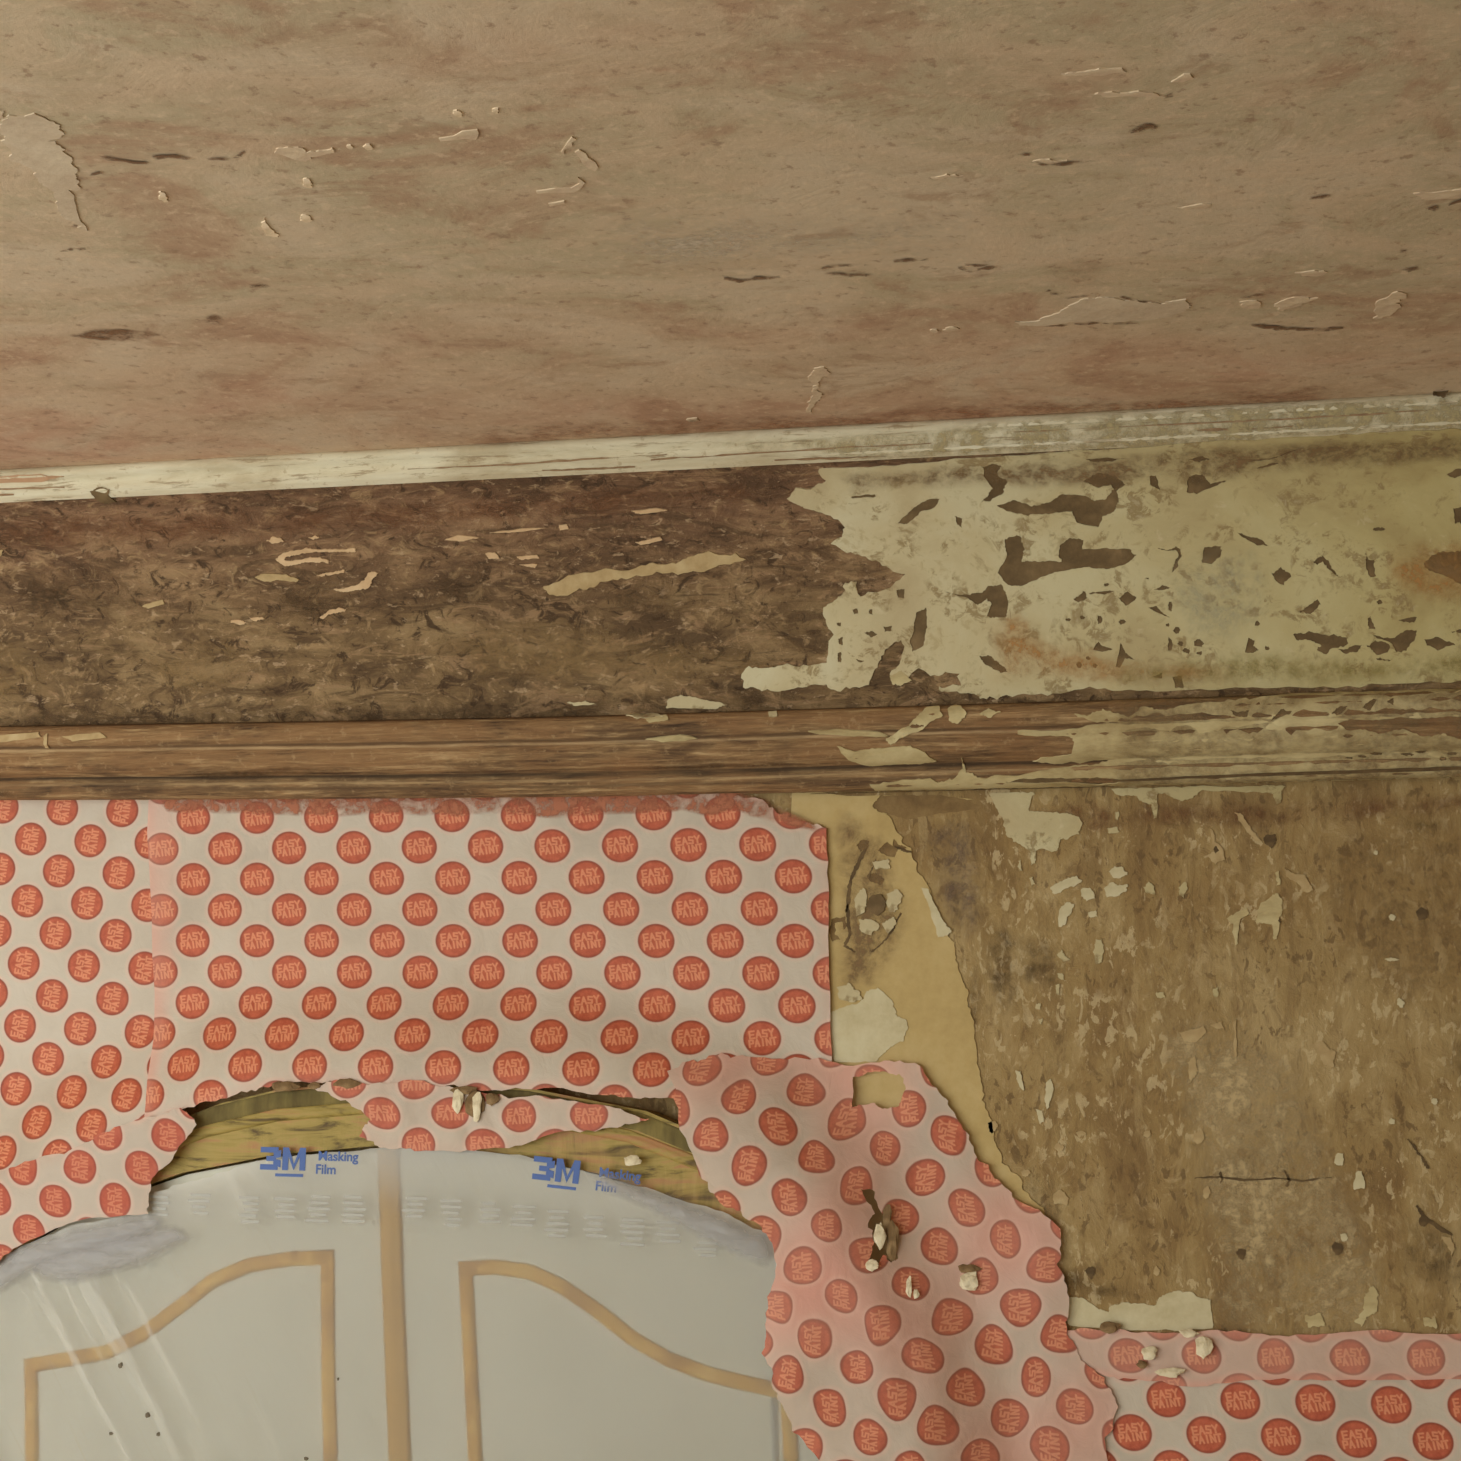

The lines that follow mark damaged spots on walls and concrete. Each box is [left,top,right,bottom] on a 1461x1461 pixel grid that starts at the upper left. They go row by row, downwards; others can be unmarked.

peeling [741,428,1461,1215]
peeling [861,1189,898,1264]
peeling [1066,1290,1214,1331]
peeling [1305,1313,1325,1328]
peeling [1354,1286,1379,1327]
peeling [1423,1317,1437,1329]